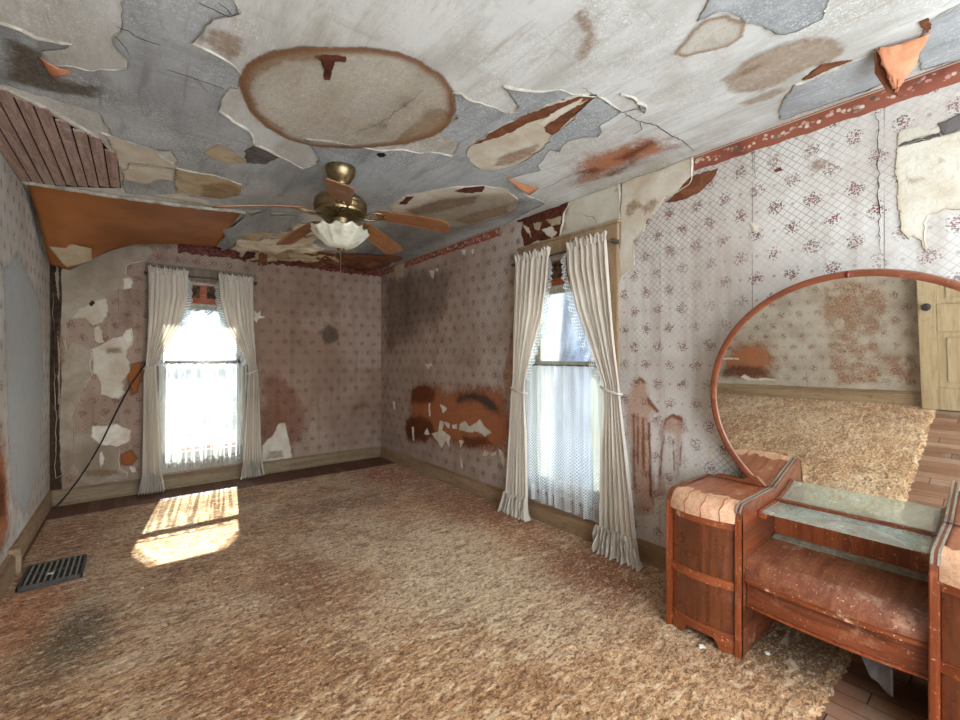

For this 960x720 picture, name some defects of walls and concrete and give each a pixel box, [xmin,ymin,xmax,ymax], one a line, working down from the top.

peeling [918,4,960,71]
peeling [0,0,647,270]
water stain [239,46,456,149]
water stain [578,140,661,180]
crack [587,91,694,151]
peeling [778,52,882,121]
crack [874,109,882,247]
peeling [72,298,108,325]
peeling [123,329,133,349]
water stain [322,326,338,343]
peeling [91,424,131,467]